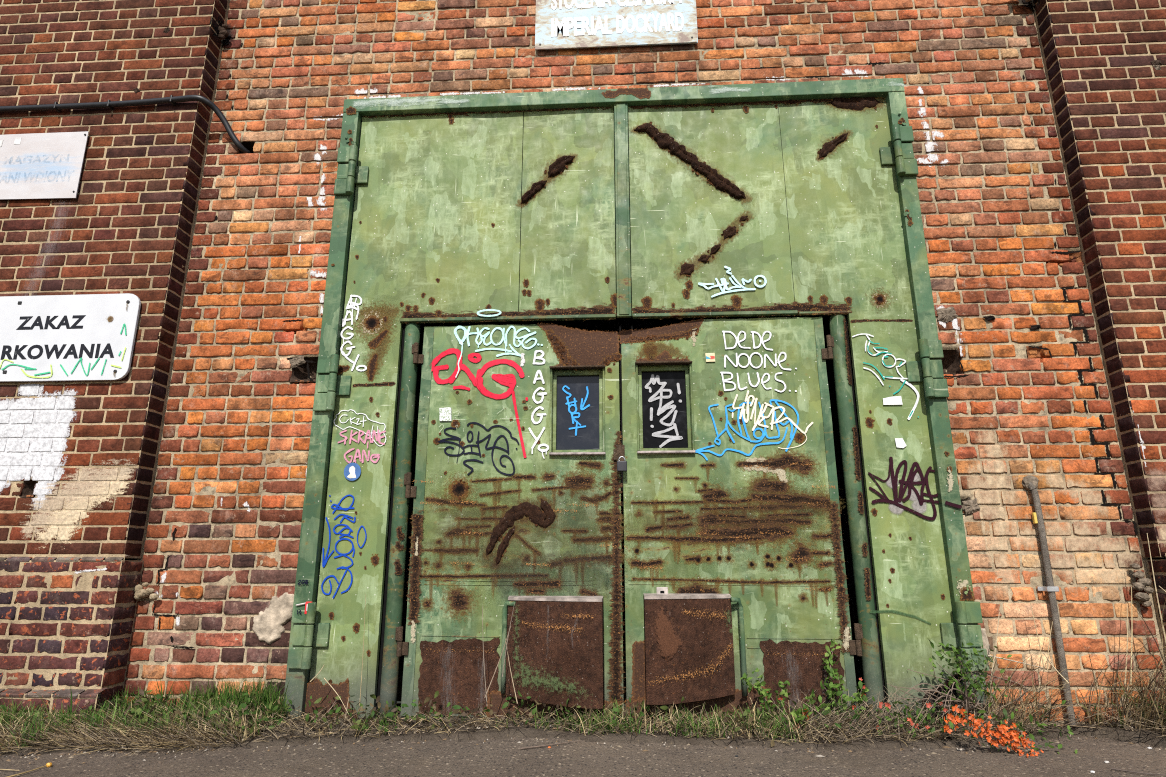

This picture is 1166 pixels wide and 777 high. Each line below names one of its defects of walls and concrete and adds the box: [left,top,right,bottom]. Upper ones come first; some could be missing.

rust [345,87,886,125]
rust [353,124,913,417]
spalling [289,356,318,384]
rust [431,419,473,446]
rust [851,410,893,517]
spalling [20,481,37,498]
rust [394,431,852,722]